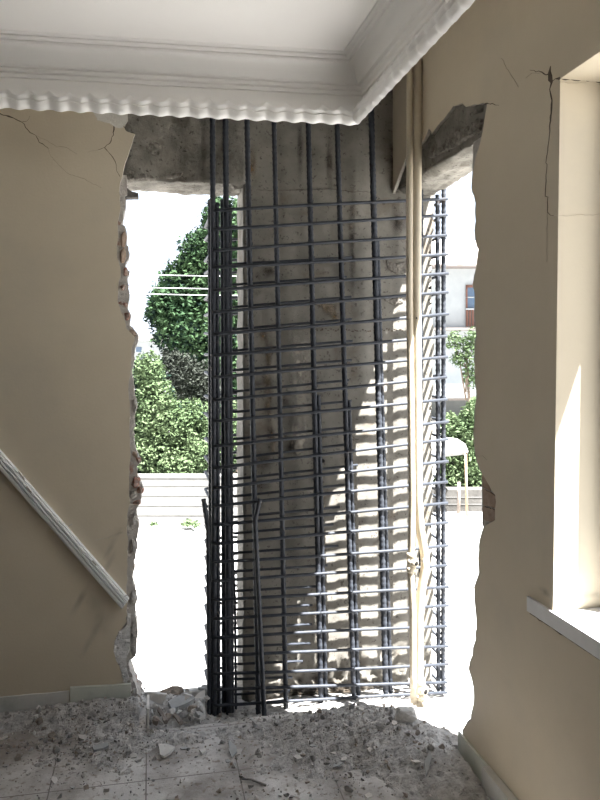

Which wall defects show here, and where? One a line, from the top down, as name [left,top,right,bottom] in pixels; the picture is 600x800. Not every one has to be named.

crack [0,113,126,188]
spalling [126,170,156,181]
spalling [424,107,484,159]
crack [501,58,600,230]
flaking render [120,231,128,291]
flaking render [129,477,144,505]
flaking render [114,590,138,695]